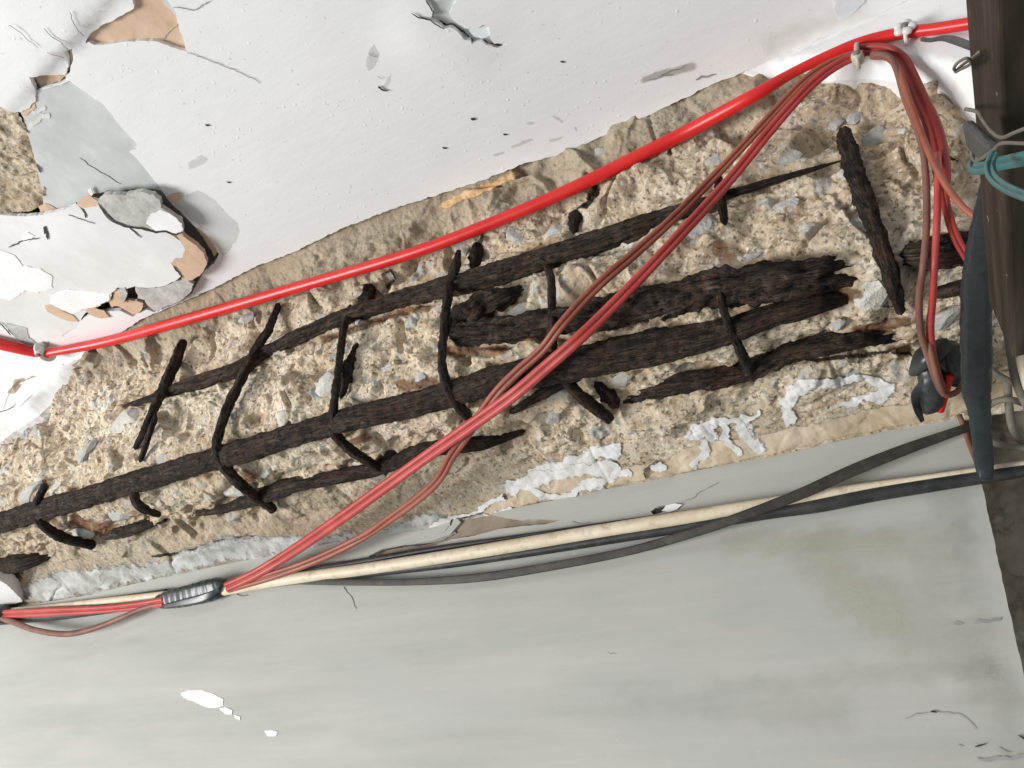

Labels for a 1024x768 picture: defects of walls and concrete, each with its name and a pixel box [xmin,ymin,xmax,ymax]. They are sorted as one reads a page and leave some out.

corrosion [712,240,734,263]
corrosion [321,306,430,343]
spalling [0,49,980,607]
corrosion [851,318,911,333]
corrosion [447,346,507,358]
spalling [991,311,1024,415]
corrosion [396,377,440,392]
corrosion [50,513,115,535]